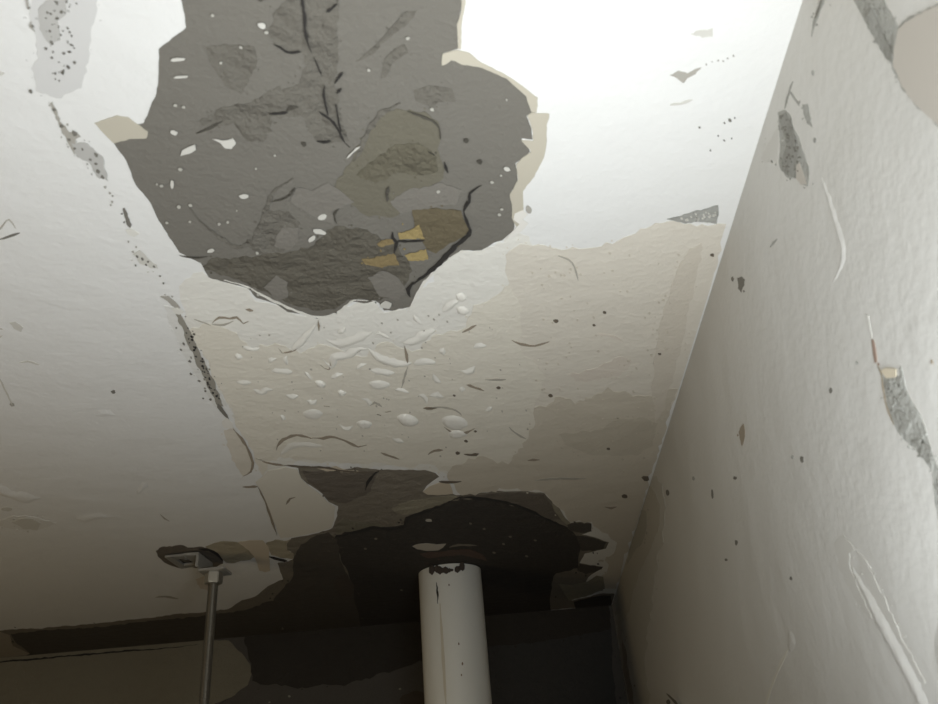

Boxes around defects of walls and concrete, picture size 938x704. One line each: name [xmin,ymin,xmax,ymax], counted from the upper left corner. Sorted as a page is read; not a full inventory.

crack [269,0,350,148]
peeling [854,0,938,126]
flaking render [95,0,549,319]
damp [334,103,445,219]
flaking render [775,110,814,188]
damp [11,210,726,704]
flaking render [877,366,938,514]